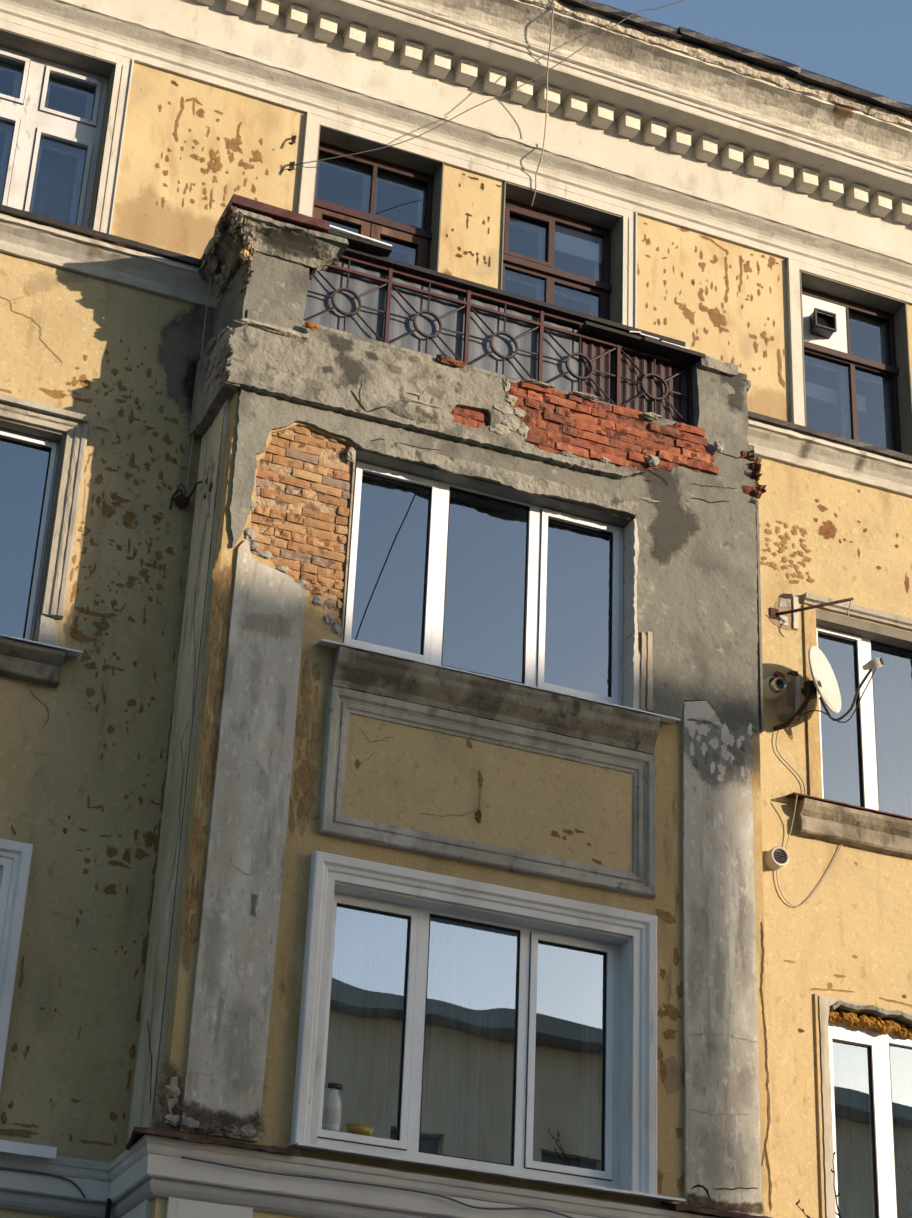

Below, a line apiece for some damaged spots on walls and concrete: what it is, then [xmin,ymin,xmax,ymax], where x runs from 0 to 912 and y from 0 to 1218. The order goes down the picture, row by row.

spalling [155,80,284,293]
peeling [637,222,787,388]
peeling [39,339,190,716]
spalling [244,425,356,637]
spalling [450,378,724,475]
damp [644,467,699,563]
spalling [742,450,767,504]
peeling [759,499,860,631]
peeling [683,705,759,786]
peeling [62,697,174,978]
spalling [150,1063,264,1144]
crack [688,922,772,1210]